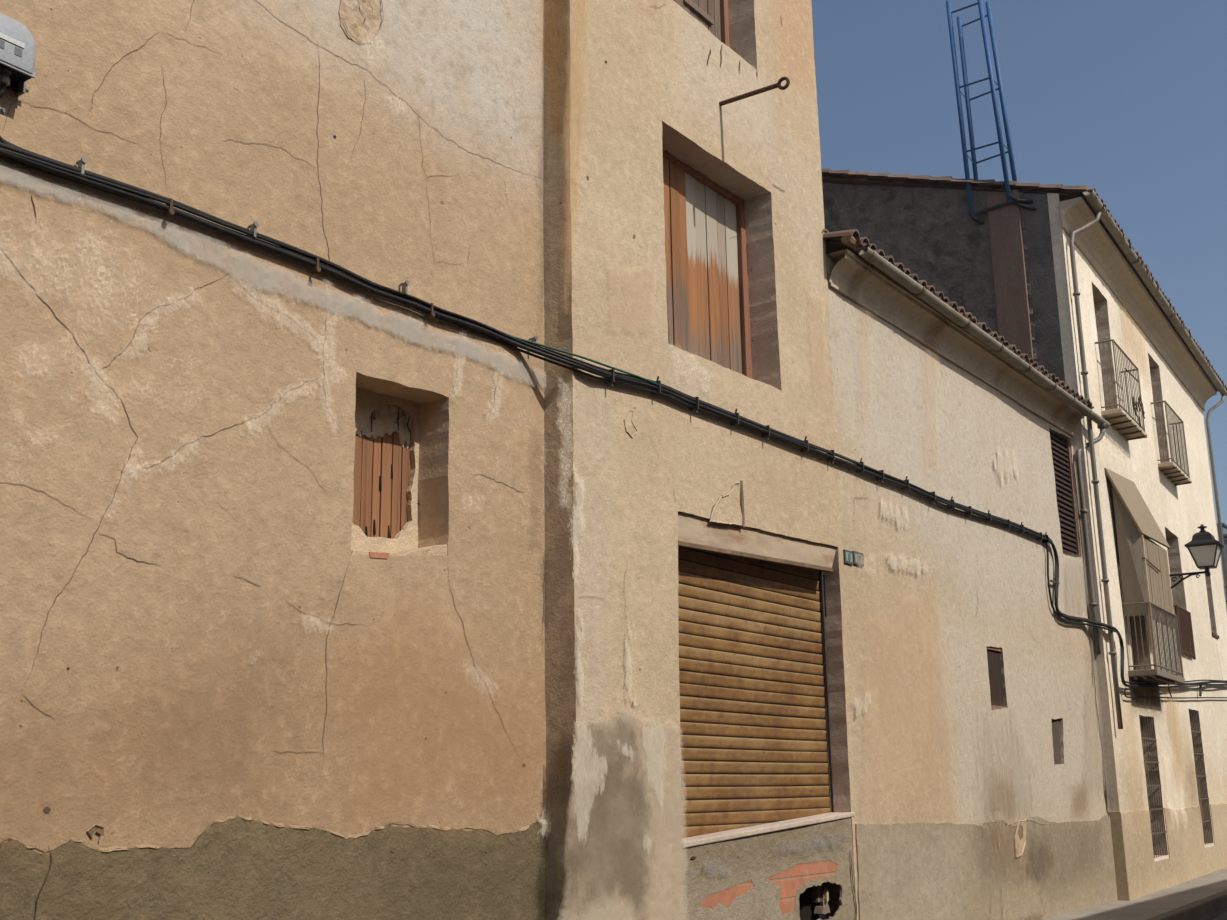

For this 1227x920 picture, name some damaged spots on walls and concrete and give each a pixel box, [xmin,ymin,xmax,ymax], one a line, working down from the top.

crack [0,0,584,718]
crack [274,563,363,762]
crack [34,845,52,920]
water stain [545,726,646,920]
flaking render [699,860,838,920]